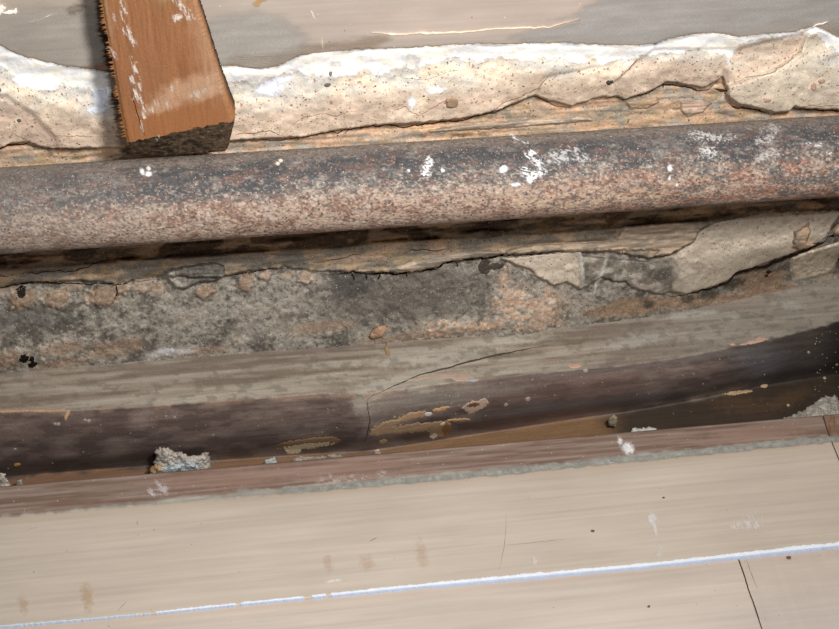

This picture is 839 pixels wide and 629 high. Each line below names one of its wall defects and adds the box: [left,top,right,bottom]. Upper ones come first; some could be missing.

crack [596,40,805,117]
crack [233,70,567,143]
crack [786,105,839,113]
crack [0,128,106,150]
peeling [394,222,710,272]
crack [0,261,160,298]
crack [227,268,284,276]
crack [305,248,570,280]
crack [366,345,547,438]
peeling [425,406,470,439]
peeling [277,442,335,454]